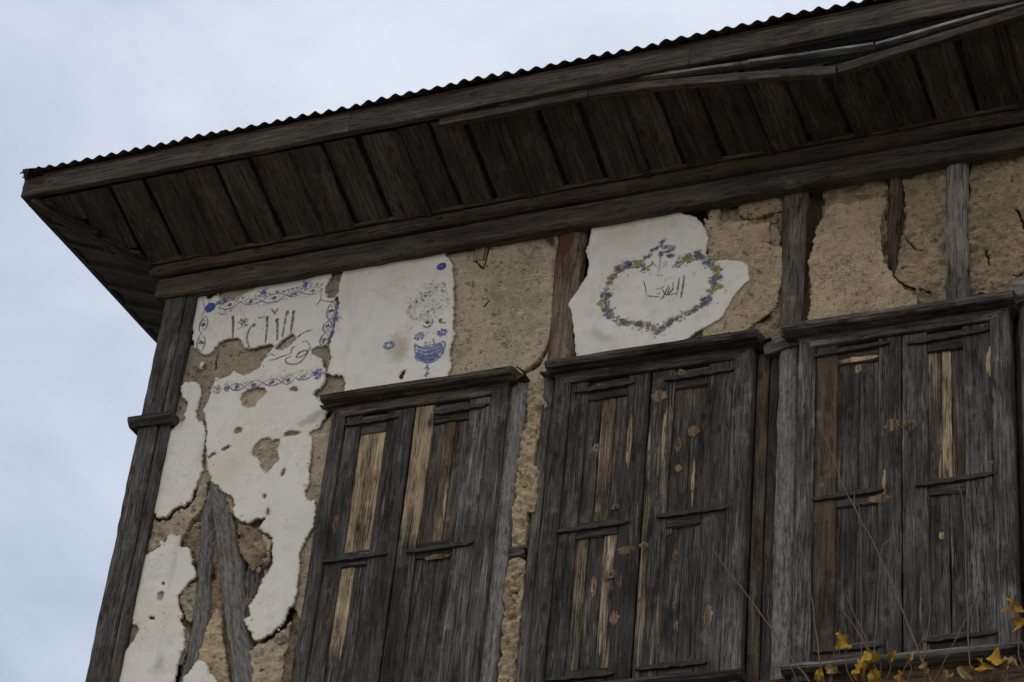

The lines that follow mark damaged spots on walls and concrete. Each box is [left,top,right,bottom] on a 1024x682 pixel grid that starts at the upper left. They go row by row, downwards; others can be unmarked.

spalling [312,346,345,401]
spalling [325,274,342,300]
peeling [446,236,559,376]
spalling [753,293,781,339]
crack [882,177,931,294]
spalling [148,335,295,682]
spalling [223,414,333,682]